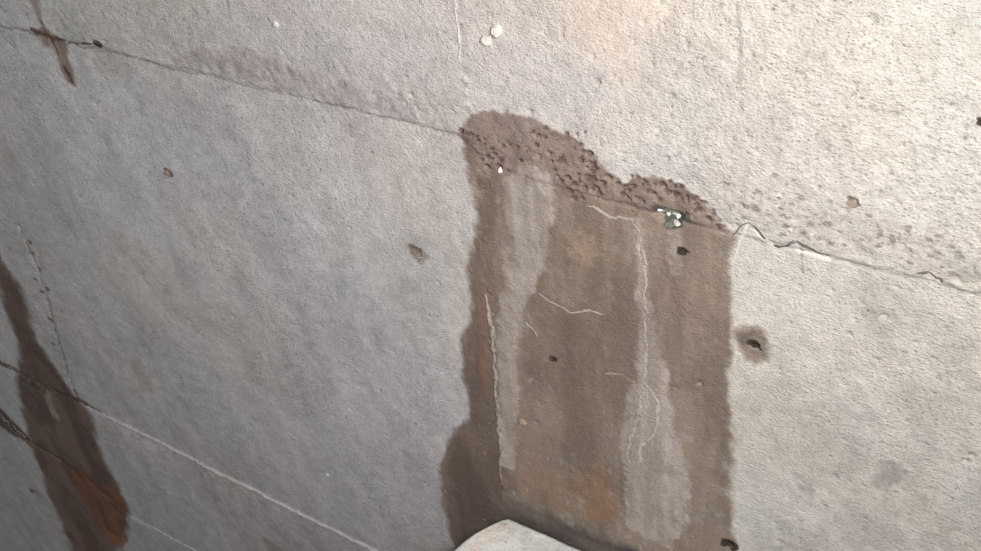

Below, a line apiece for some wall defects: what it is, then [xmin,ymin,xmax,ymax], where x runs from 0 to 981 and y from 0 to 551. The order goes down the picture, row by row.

crack [730,222,981,297]
water stain [435,106,776,551]
rust [58,454,136,549]